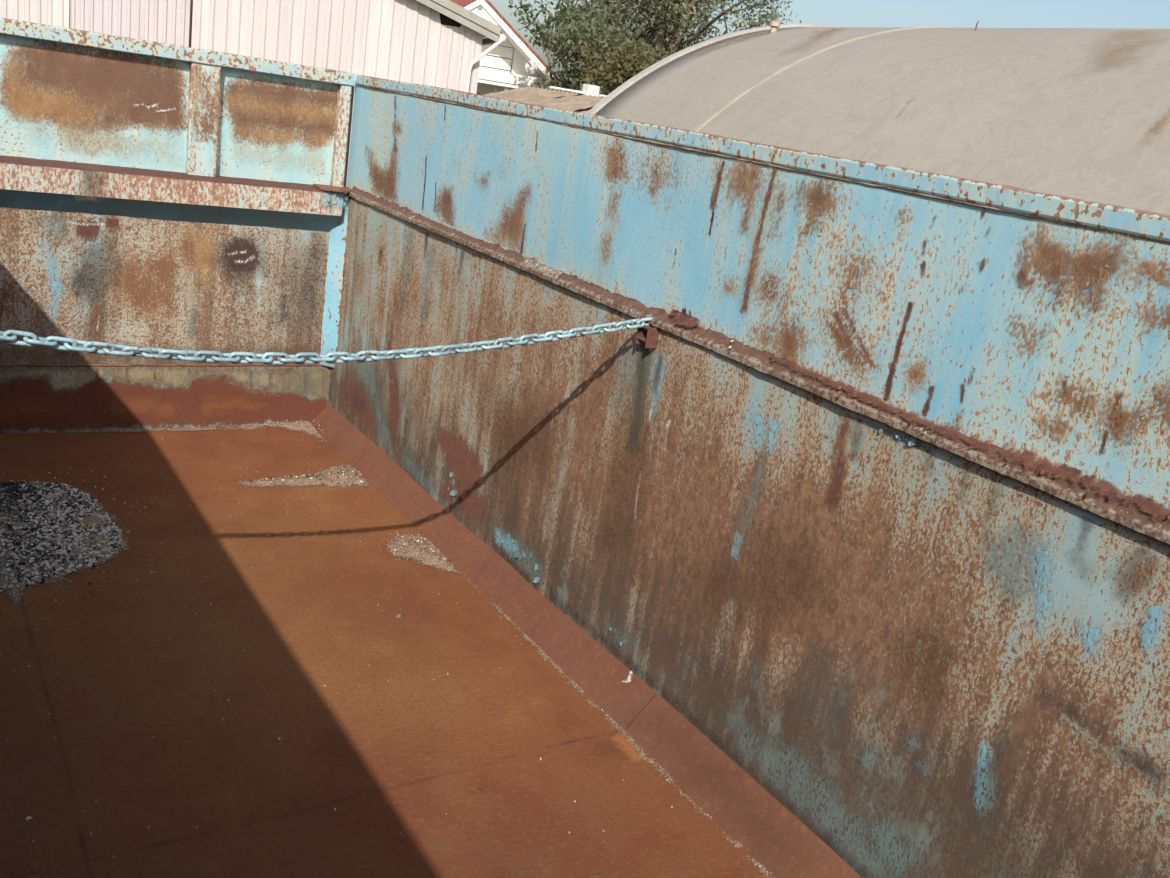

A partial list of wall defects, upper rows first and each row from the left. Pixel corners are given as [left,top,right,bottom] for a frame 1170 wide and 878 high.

rust [0,40,337,163]
rust [71,218,119,241]
rust [103,231,260,329]
rust [433,183,455,226]
rust [483,180,532,253]
rust [599,135,683,266]
rust [712,159,849,365]
rust [833,234,892,312]
rust [1006,221,1170,361]
rust [0,375,327,432]
rust [1033,370,1170,455]
rust [824,414,851,514]